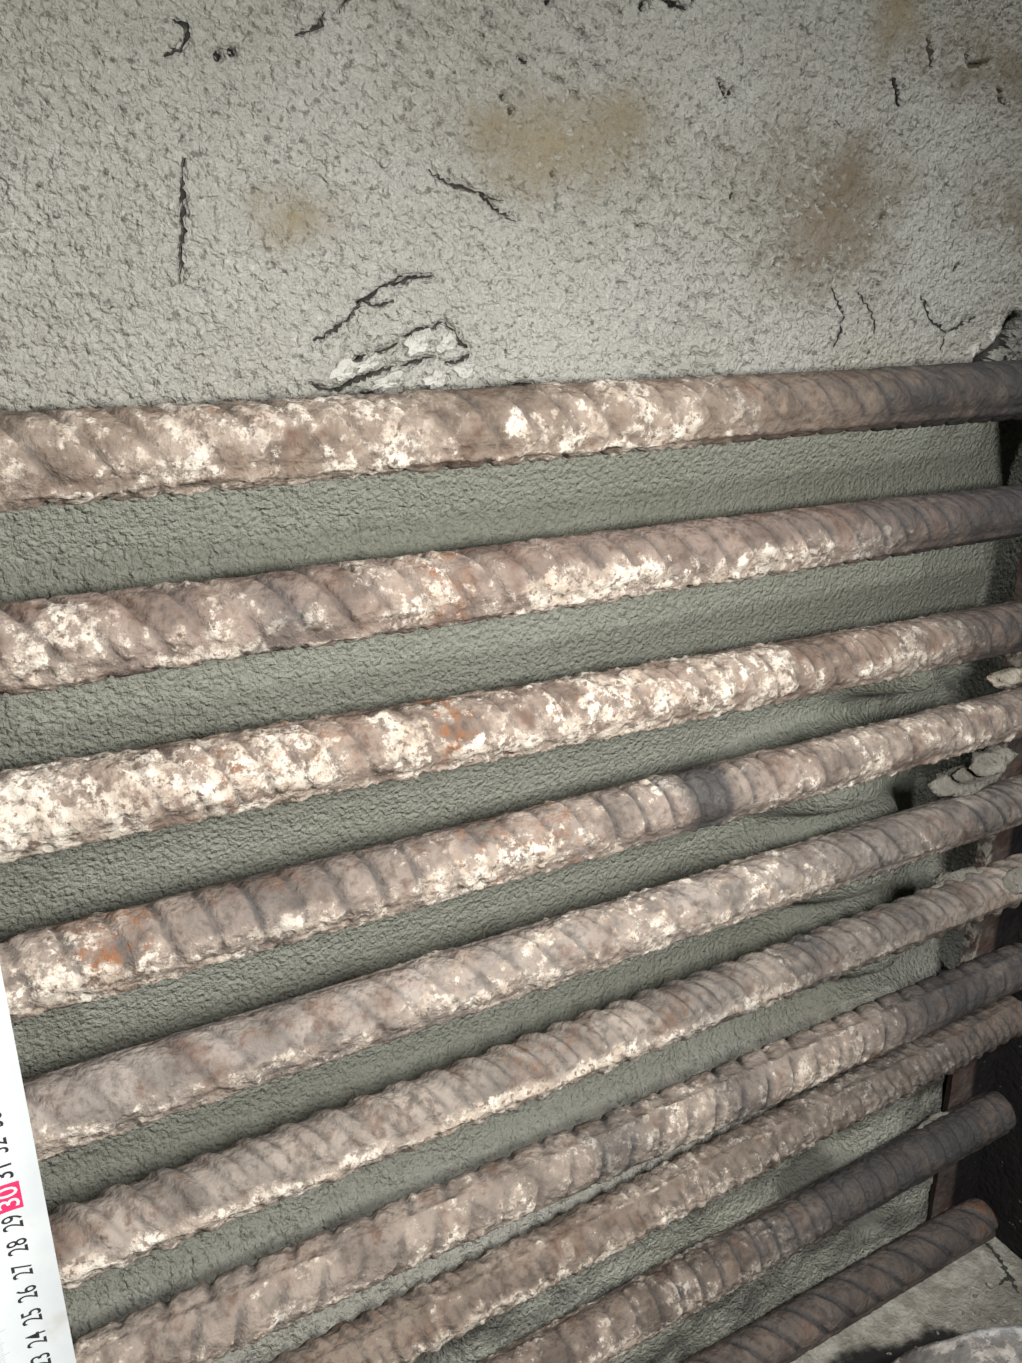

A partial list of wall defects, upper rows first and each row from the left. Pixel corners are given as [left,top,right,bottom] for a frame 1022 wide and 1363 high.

crack [179,158,188,283]
crack [314,275,403,341]
flaking render [392,275,432,286]
crack [831,288,876,347]
crack [921,297,975,350]
flaking render [311,321,476,397]